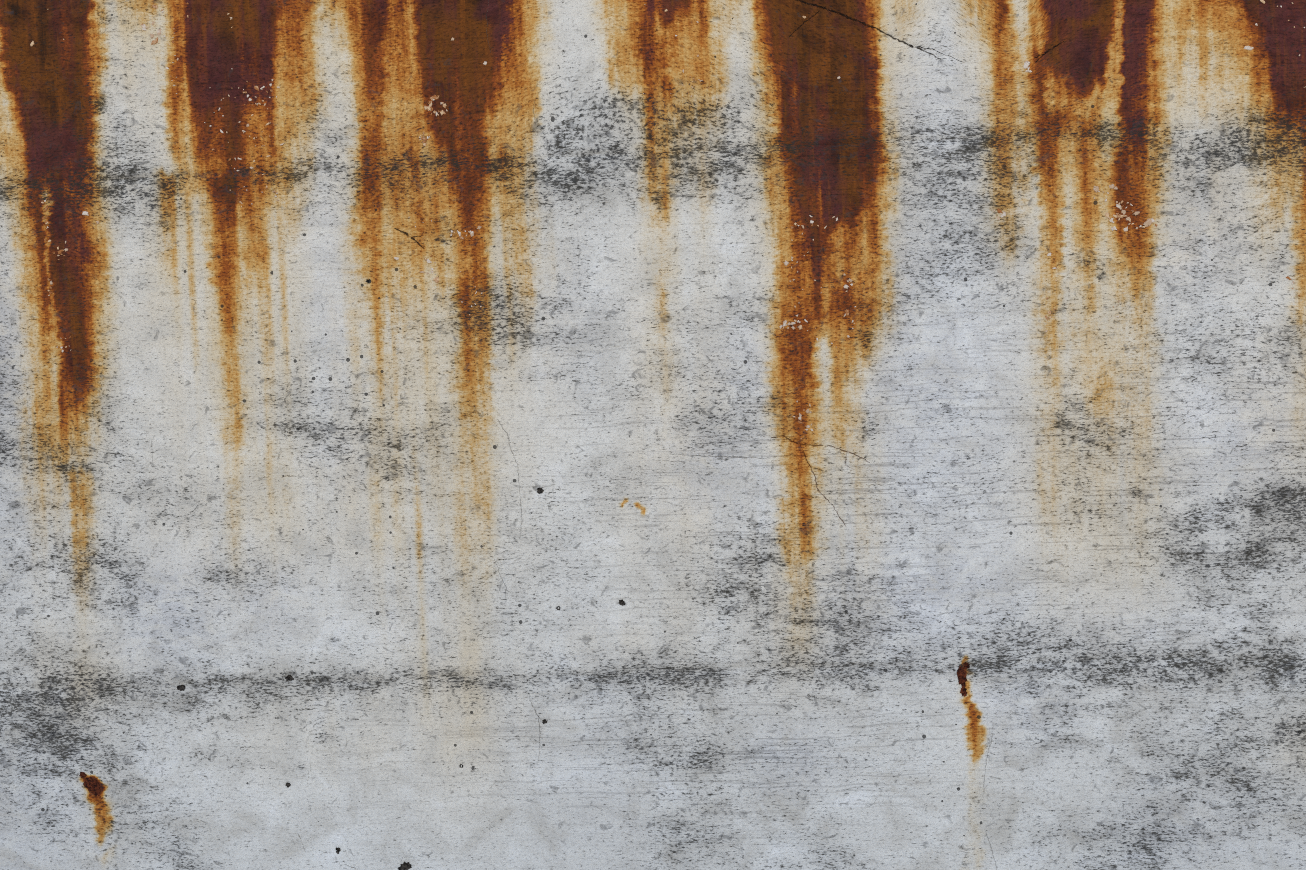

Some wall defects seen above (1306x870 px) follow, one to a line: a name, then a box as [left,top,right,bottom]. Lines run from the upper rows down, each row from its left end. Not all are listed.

water stain [90,0,128,32]
crack [789,0,962,62]
water stain [0,49,1306,358]
rust [0,0,1306,670]
rust [417,693,524,802]
water stain [0,542,1306,870]
rust [949,688,995,870]